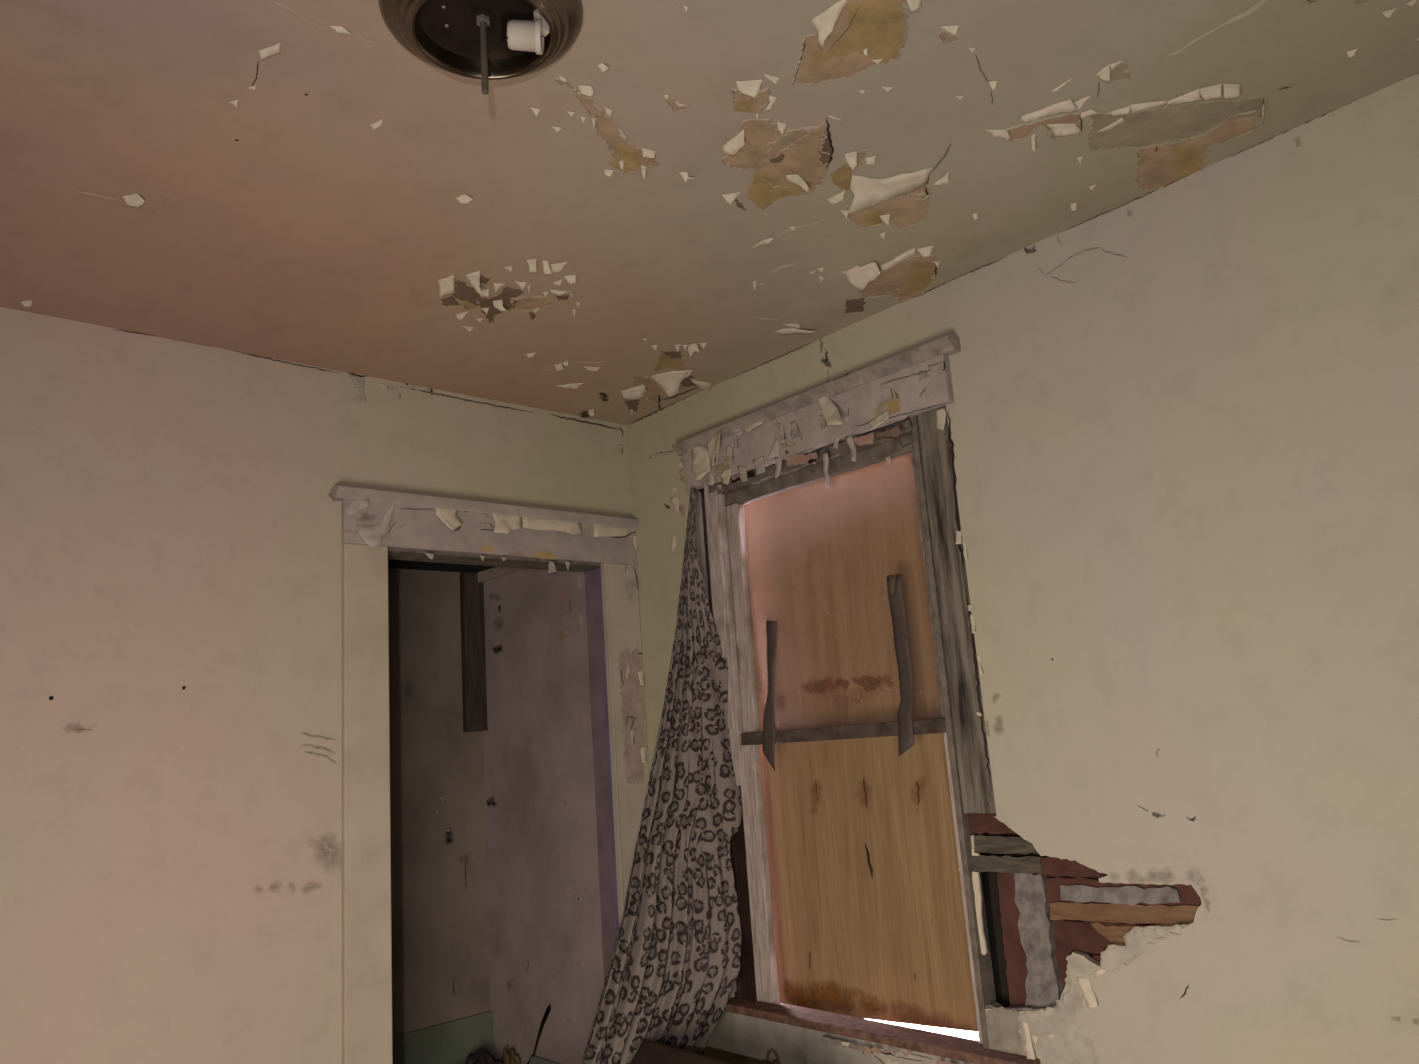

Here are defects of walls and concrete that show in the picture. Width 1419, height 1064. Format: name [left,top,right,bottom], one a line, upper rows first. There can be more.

crack [268,0,379,44]
peeling [937,25,962,43]
peeling [530,75,661,180]
peeling [721,0,952,240]
peeling [985,60,1269,191]
peeling [438,259,581,332]
peeling [841,245,941,313]
peeling [621,343,712,415]
spalling [967,813,1201,1064]